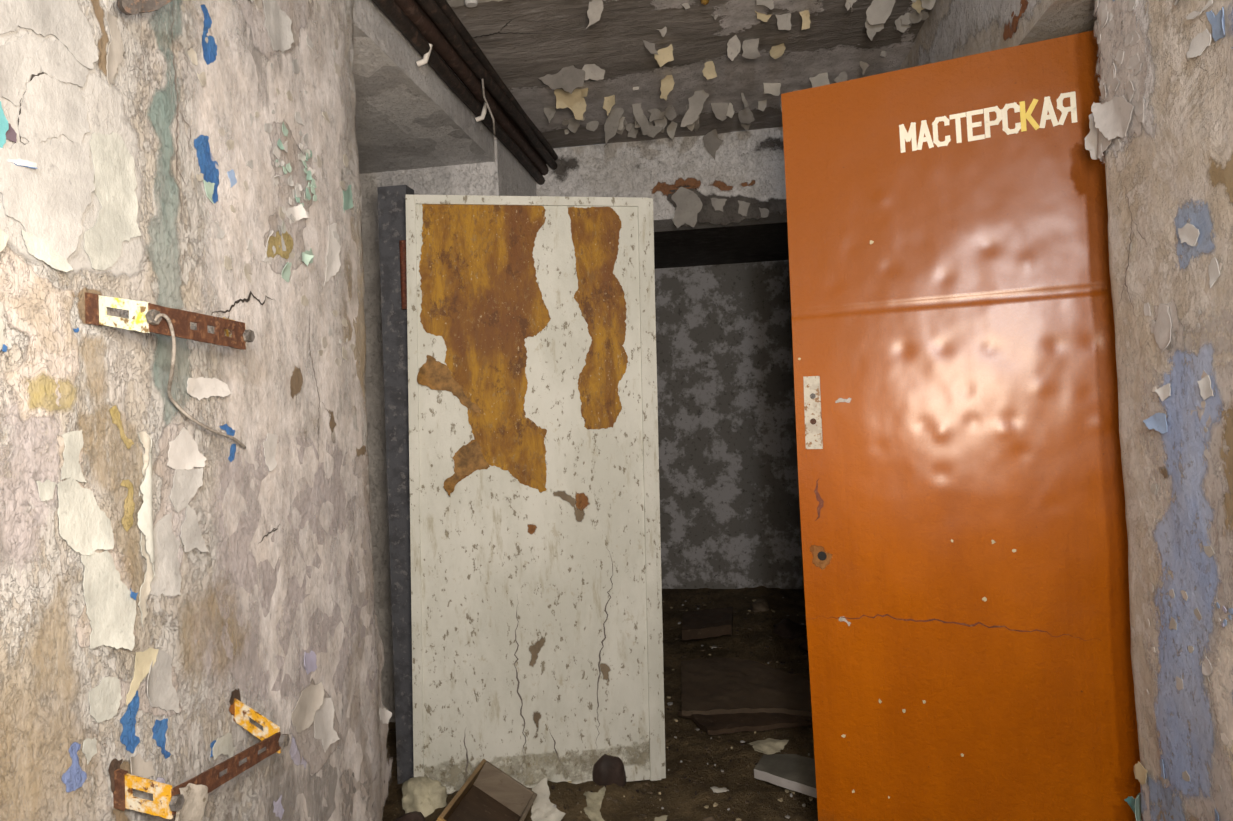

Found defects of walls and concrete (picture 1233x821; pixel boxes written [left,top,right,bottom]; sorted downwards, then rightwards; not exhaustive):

peeling [1186,0,1233,58]
crack [18,72,44,144]
peeling [508,0,1041,160]
peeling [1085,0,1156,163]
peeling [651,178,787,229]
peeling [1175,201,1223,288]
peeling [1209,154,1233,203]
peeling [0,0,392,821]